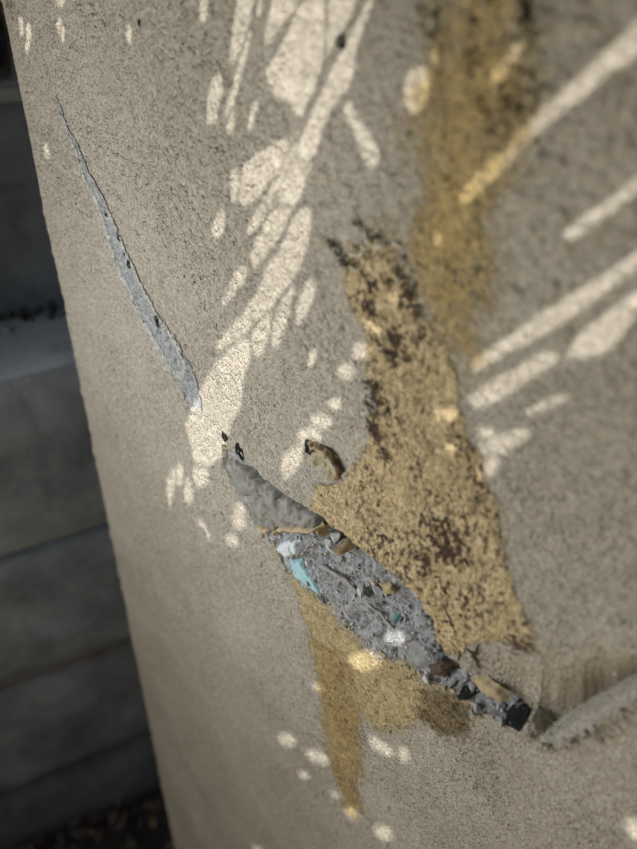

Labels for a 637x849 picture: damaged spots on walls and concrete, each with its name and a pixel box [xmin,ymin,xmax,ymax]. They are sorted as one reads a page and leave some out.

crack [55,93,202,411]
rust [381,0,552,374]
crack [221,432,244,462]
peeling [225,237,538,732]
rust [280,555,475,818]
crack [527,707,635,752]